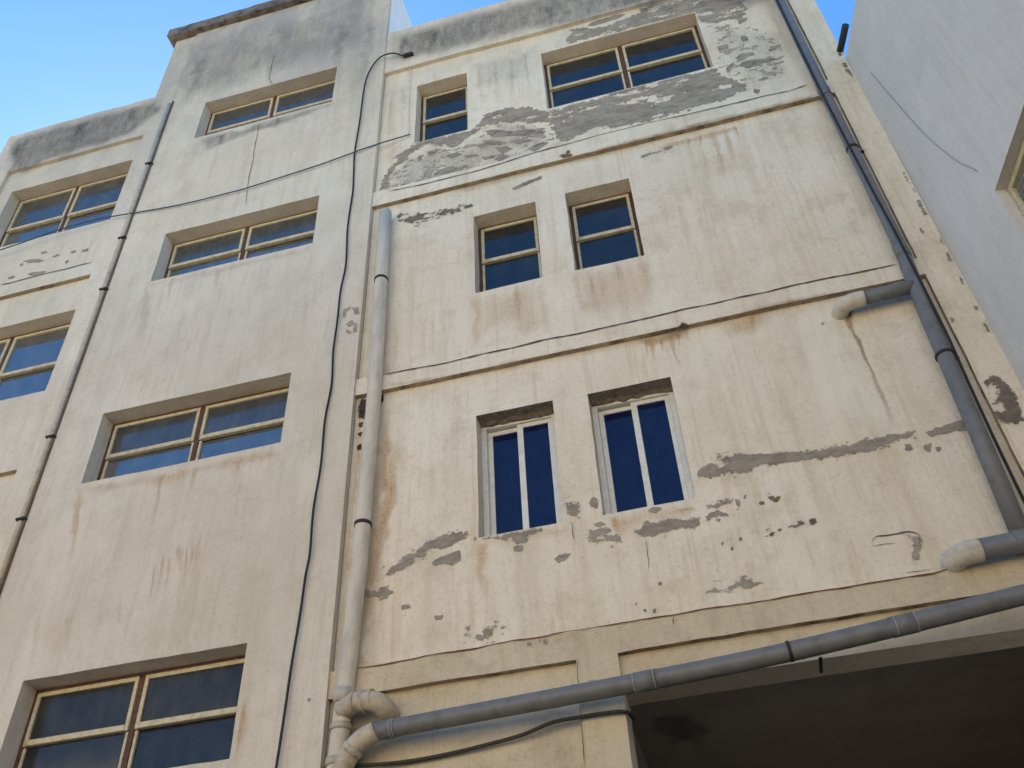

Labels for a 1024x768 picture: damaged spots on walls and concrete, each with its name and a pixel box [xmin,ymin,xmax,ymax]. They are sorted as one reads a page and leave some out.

flaking render [379,0,784,191]
flaking render [397,204,473,226]
flaking render [8,248,88,279]
flaking render [339,307,359,334]
crack [383,264,895,375]
flaking render [984,375,1024,424]
flaking render [697,420,966,479]
flaking render [588,521,622,548]
flaking render [634,495,747,537]
flaking render [364,528,542,600]
flaking render [706,575,761,593]
flaking render [464,621,504,644]